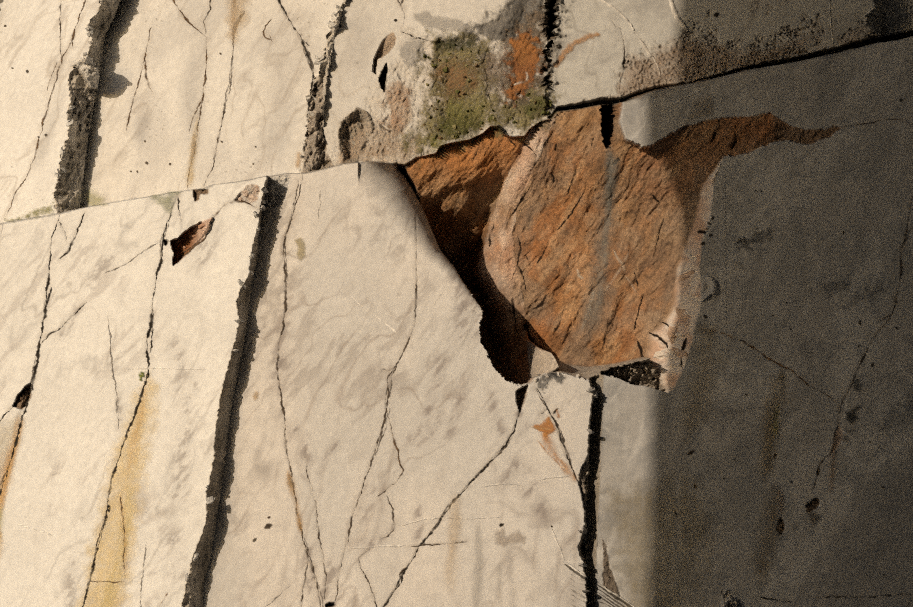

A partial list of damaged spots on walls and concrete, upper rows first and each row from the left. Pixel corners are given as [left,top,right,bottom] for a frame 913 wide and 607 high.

crack [262,0,314,115]
leakage [400,37,427,67]
leakage [414,0,556,127]
rust [505,33,544,103]
crack [0,212,85,495]
leakage [87,400,148,607]
crack [82,0,252,607]
spalling [171,218,213,266]
spalling [182,175,290,607]
crack [266,178,583,607]
rust [534,415,559,449]
spalling [402,102,844,607]